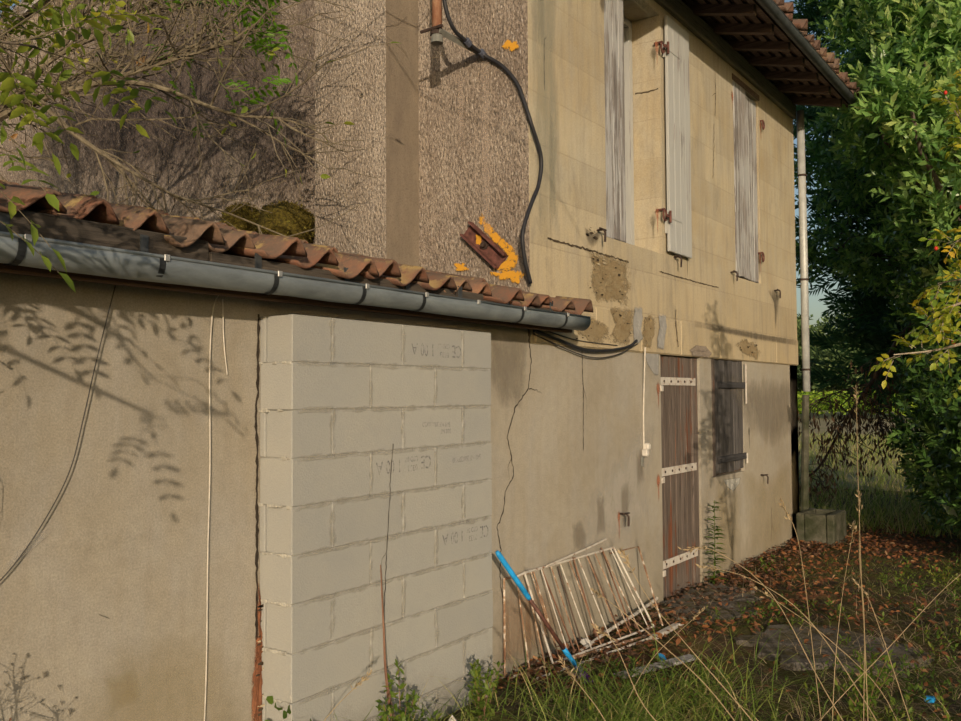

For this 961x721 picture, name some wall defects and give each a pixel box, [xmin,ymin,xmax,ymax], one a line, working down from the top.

spalling [576,227,655,347]
spalling [737,339,758,359]
crack [497,329,538,603]